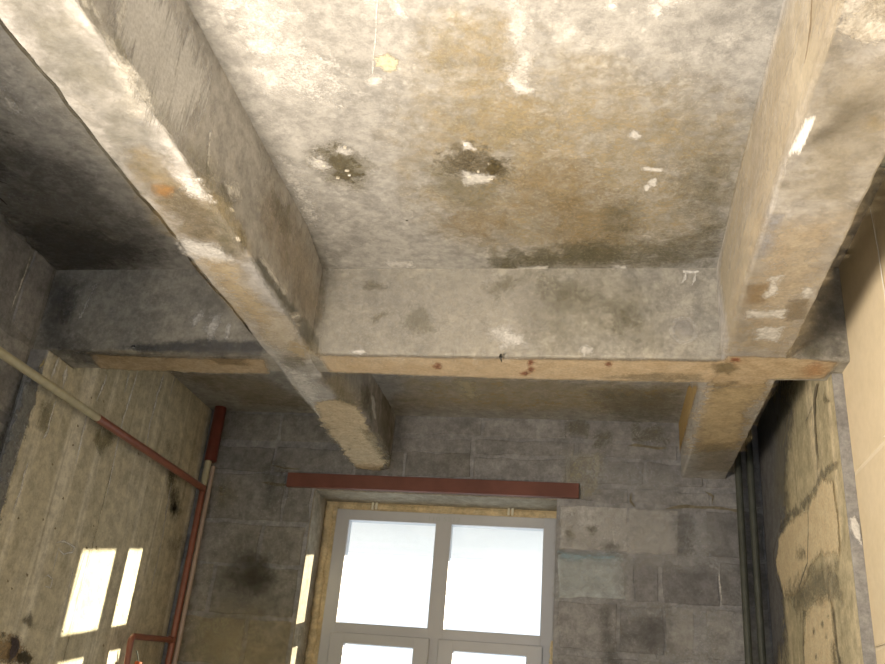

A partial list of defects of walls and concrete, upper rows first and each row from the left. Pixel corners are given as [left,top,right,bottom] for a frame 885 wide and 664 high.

water stain [112,0,210,140]
crack [0,19,252,334]
spalling [308,144,367,186]
spalling [434,141,514,185]
water stain [643,167,663,191]